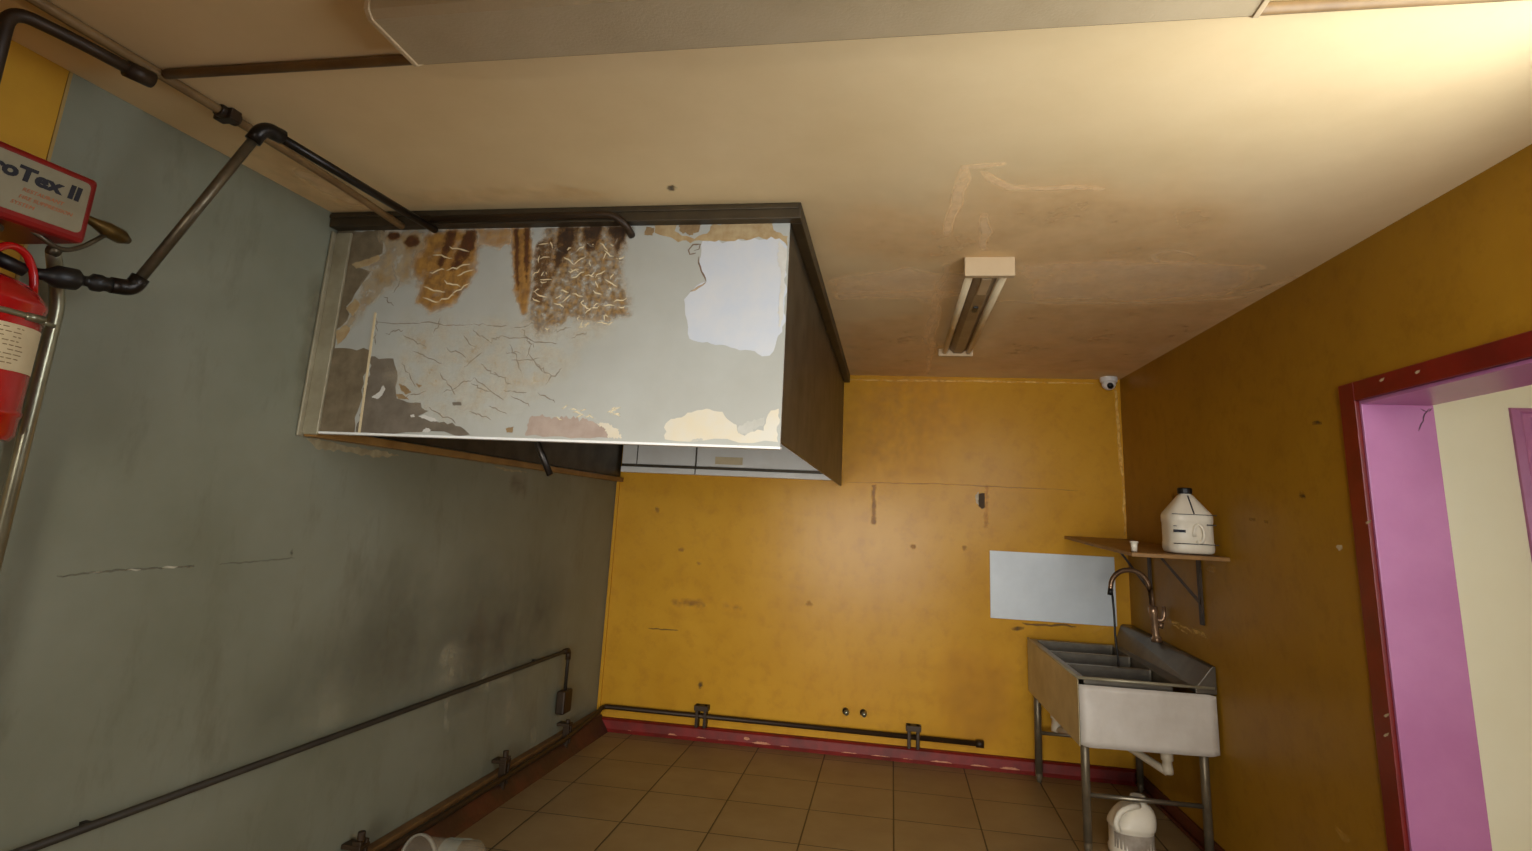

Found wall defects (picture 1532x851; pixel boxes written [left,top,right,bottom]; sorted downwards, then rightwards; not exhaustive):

crack [374,239,625,423]
peeling [644,223,788,356]
crack [61,565,192,577]